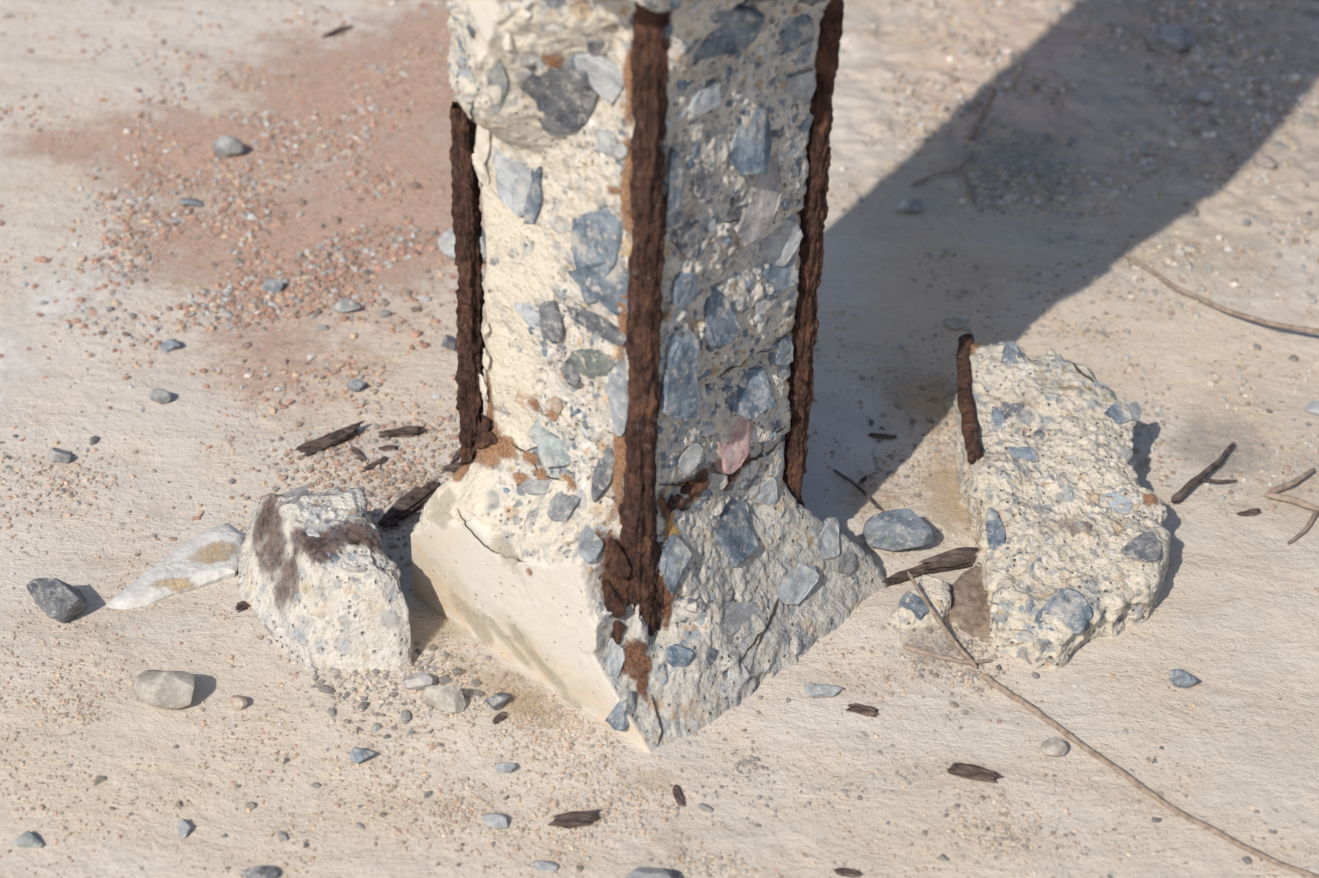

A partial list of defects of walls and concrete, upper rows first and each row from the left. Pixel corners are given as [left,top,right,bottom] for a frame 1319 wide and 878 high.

rust [607,42,633,238]
rust [452,369,547,484]
rust [528,399,558,421]
rust [617,295,627,359]
spalling [412,0,888,751]
rust [597,431,652,702]
rust [655,569,675,630]
crack [738,598,779,667]